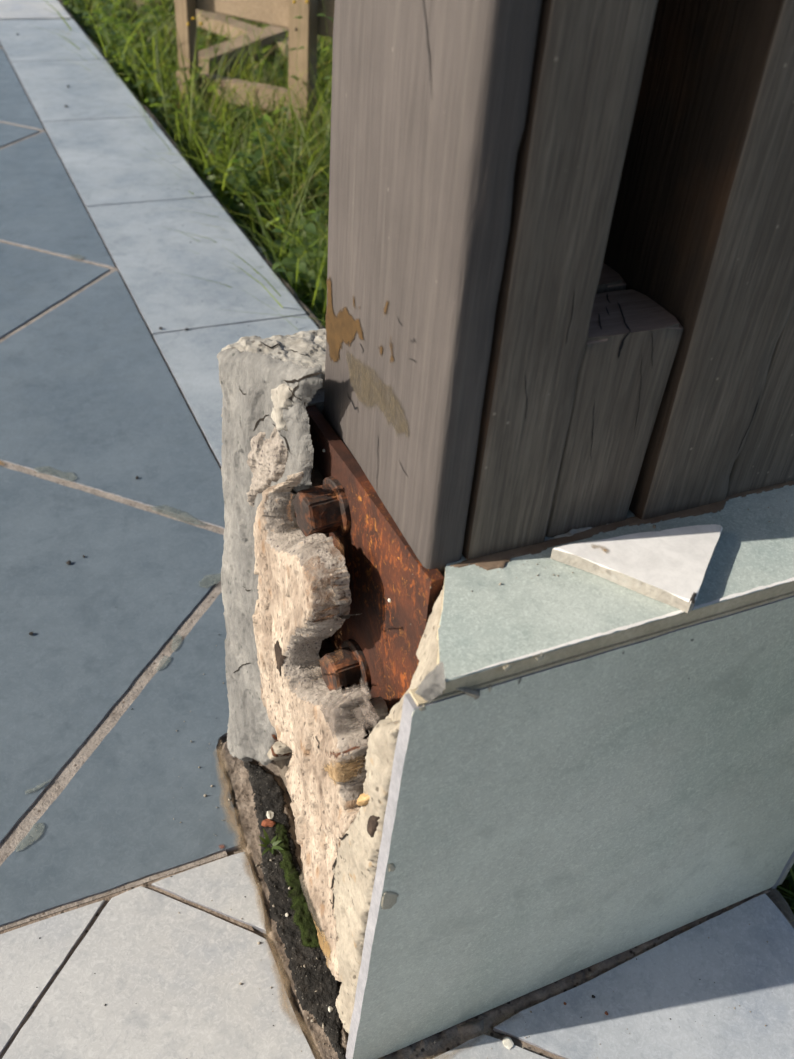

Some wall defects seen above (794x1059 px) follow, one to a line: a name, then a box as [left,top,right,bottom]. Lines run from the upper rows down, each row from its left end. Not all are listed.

crack [423,1,432,100]
spalling [246,383,388,982]
peeling [381,891,399,910]